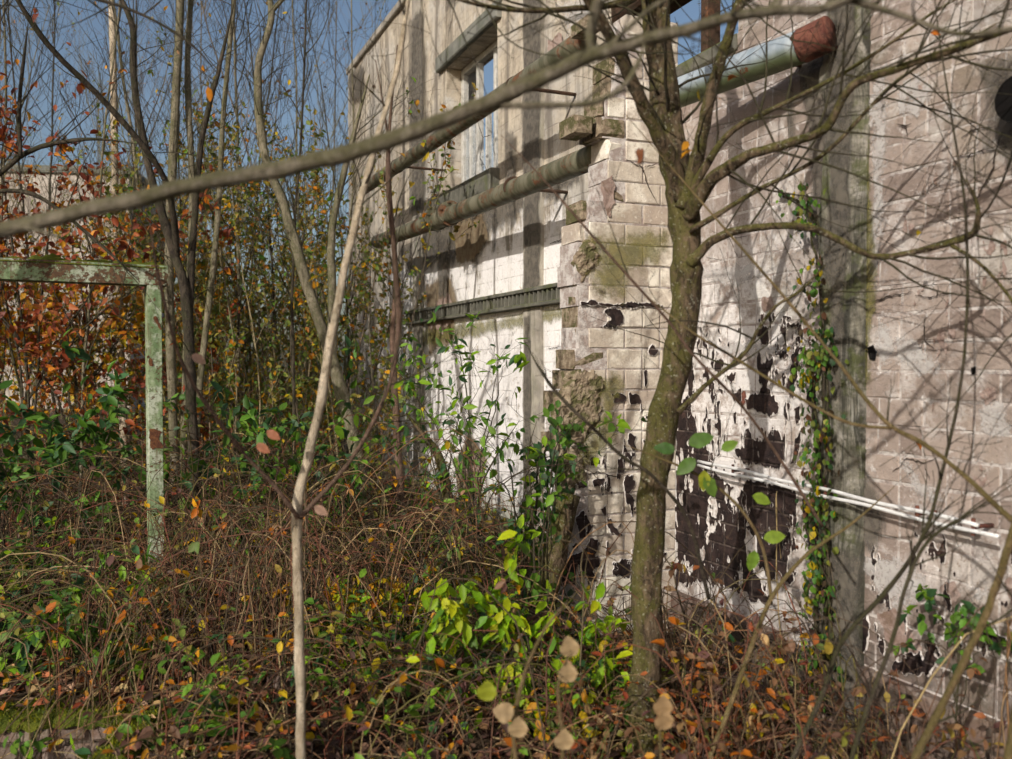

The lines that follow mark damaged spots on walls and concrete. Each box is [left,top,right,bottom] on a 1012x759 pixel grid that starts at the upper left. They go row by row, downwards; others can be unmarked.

leakage [523,0,542,68]
leakage [505,91,540,179]
leakage [787,56,826,220]
leakage [399,177,578,308]
peeling [580,299,663,330]
peeling [611,370,648,419]
peeling [663,296,819,606]
peeling [560,432,645,589]
peeling [862,547,942,677]
peeling [911,520,963,624]
peeling [977,629,1007,657]
spalling [1001,552,1012,607]